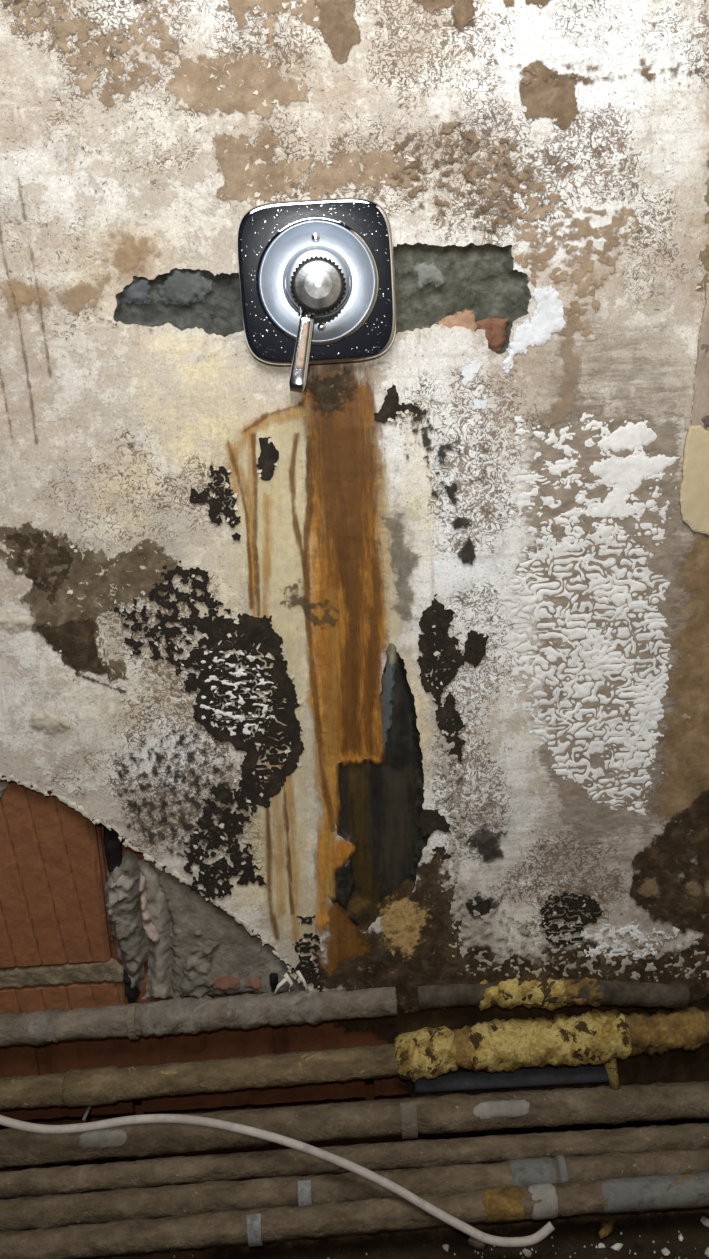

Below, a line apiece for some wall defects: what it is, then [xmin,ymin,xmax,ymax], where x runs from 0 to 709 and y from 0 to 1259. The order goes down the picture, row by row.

flaking render [1,0,651,354]
peeling [518,58,701,130]
peeling [695,160,709,291]
flaking render [0,773,308,1015]
leakage [189,465,241,541]
leakage [111,560,338,907]
rust [227,362,390,939]
leakage [287,513,709,1044]
flaking render [327,643,709,982]
leakage [396,1043,709,1098]